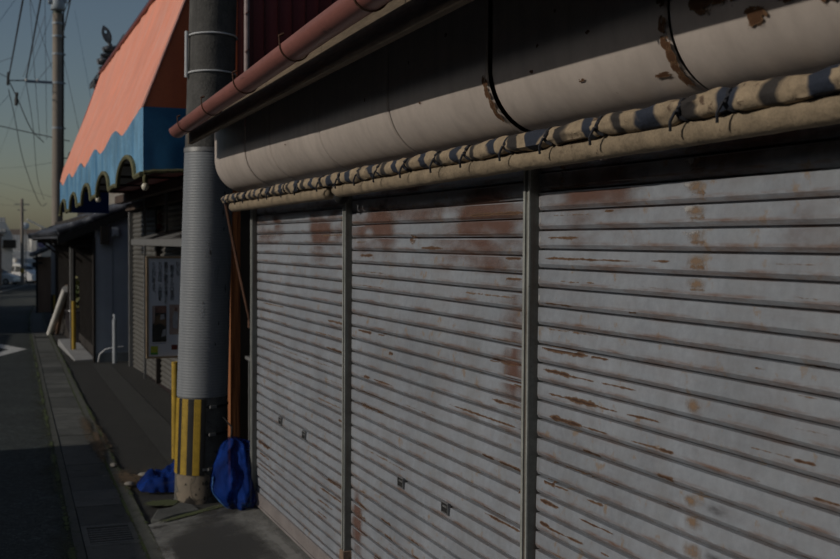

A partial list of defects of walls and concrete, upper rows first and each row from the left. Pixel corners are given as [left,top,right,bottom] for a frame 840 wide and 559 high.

corrosion [688,0,734,15]
corrosion [744,6,768,27]
corrosion [655,0,695,86]
corrosion [551,163,635,215]
corrosion [357,205,428,246]
corrosion [454,189,523,268]
corrosion [542,346,608,360]
corrosion [544,369,633,390]
corrosion [550,393,617,412]
corrosion [550,415,606,434]